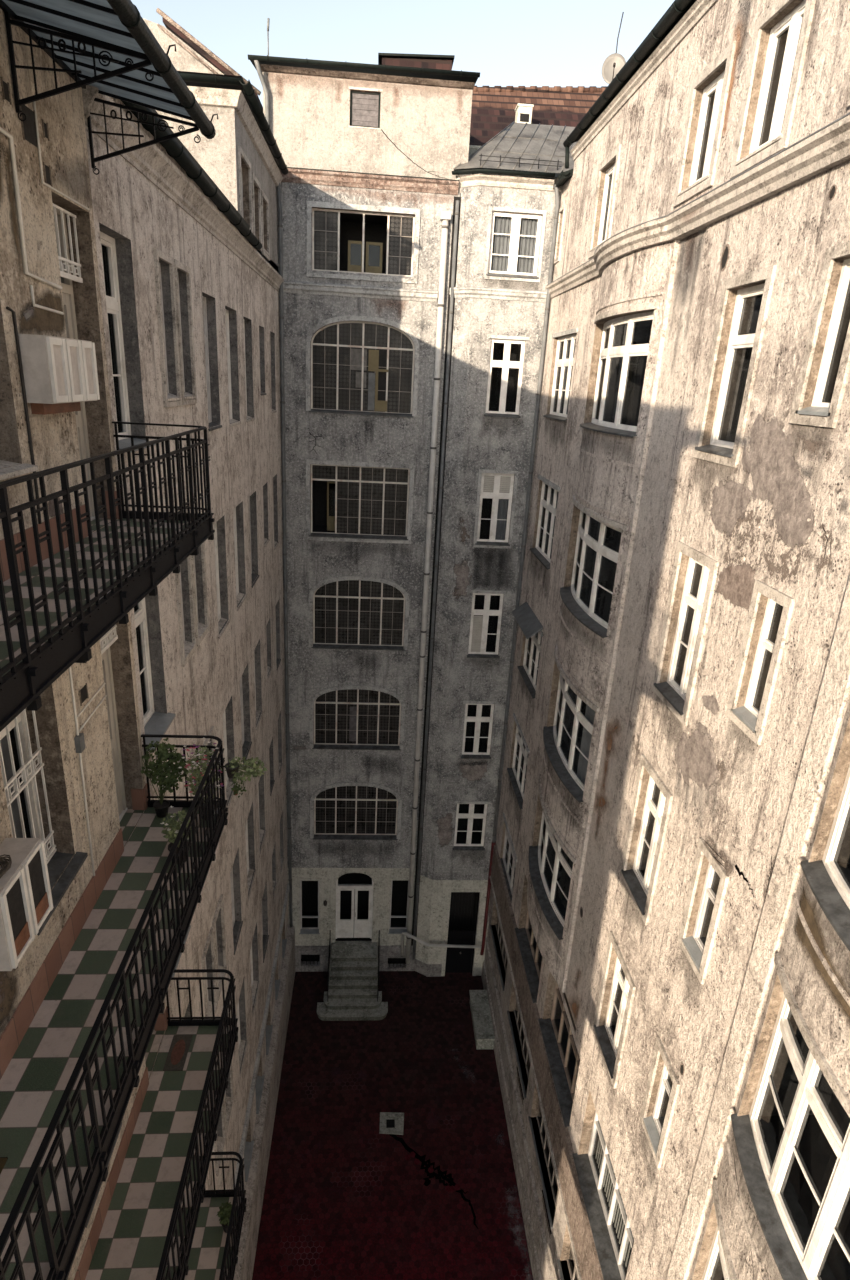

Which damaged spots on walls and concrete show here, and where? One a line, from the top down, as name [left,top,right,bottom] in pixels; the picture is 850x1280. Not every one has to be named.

crack [389,1134,478,1229]